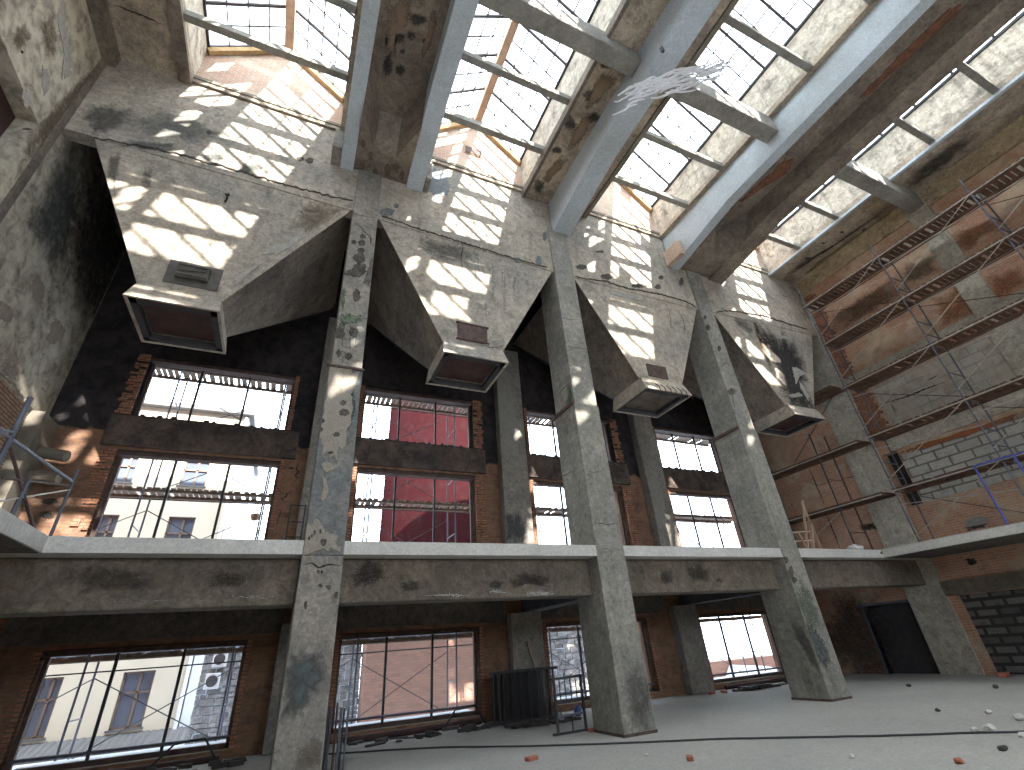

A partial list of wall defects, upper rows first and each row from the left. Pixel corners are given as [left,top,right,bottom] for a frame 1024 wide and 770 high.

damp [85,107,125,132]
spalling [344,234,367,302]
peeling [320,326,359,501]
peeling [302,519,341,557]
damp [516,574,550,595]